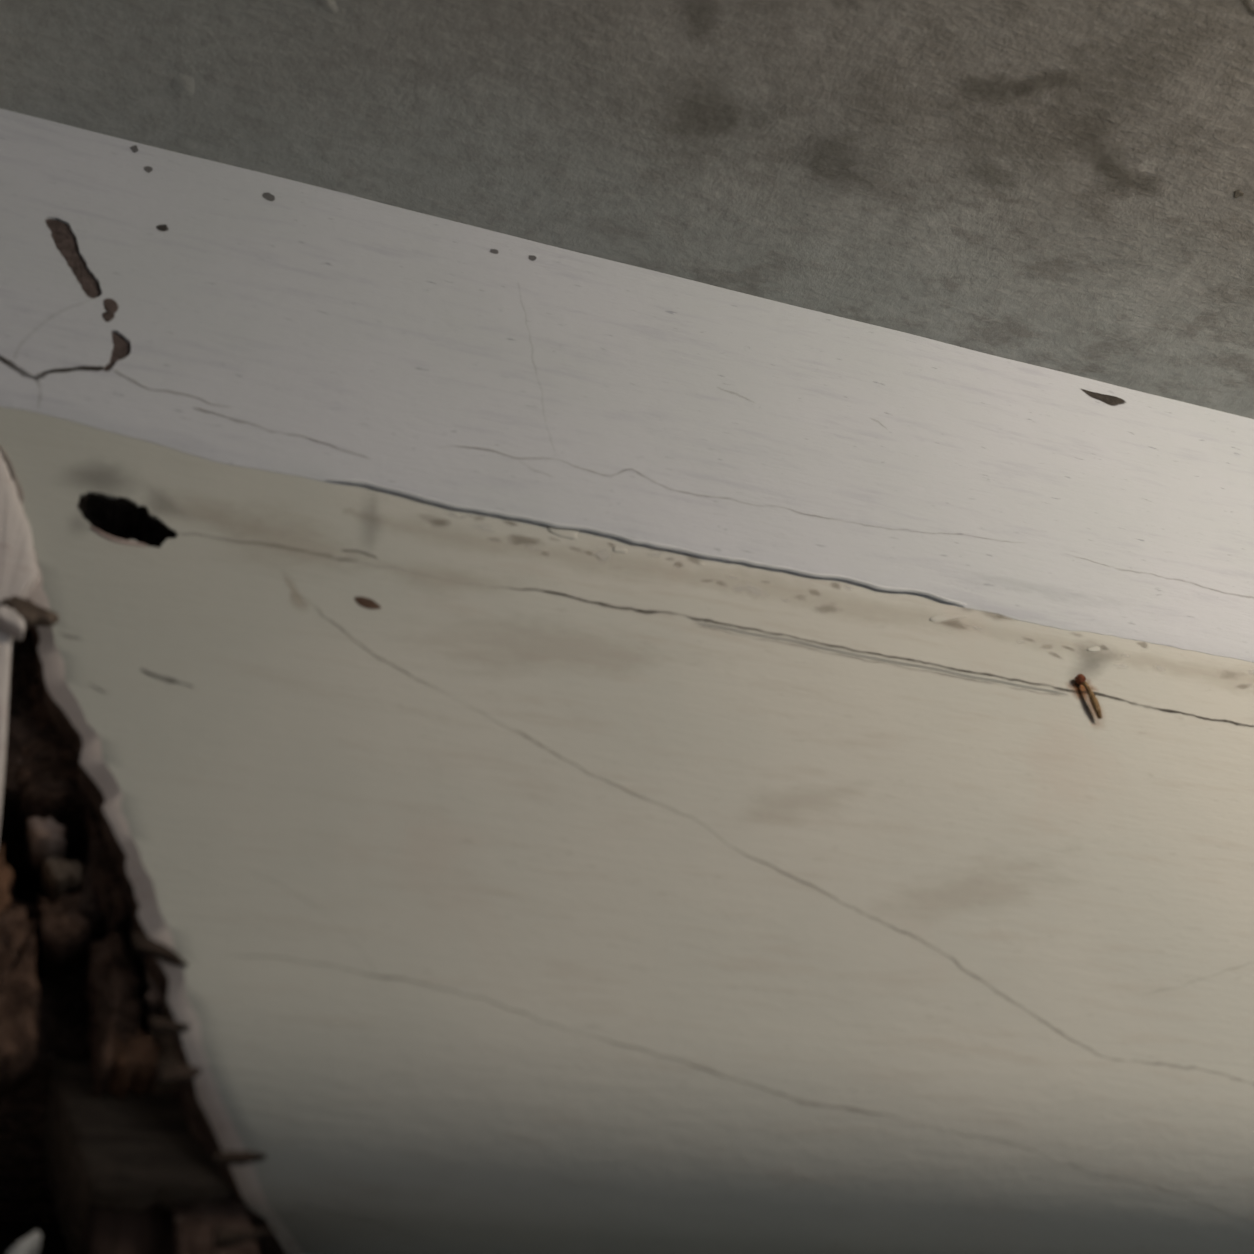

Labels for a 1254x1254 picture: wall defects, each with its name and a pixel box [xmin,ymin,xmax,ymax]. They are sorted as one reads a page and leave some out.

peeling [0,595,59,641]
flaking render [6,1230,41,1254]